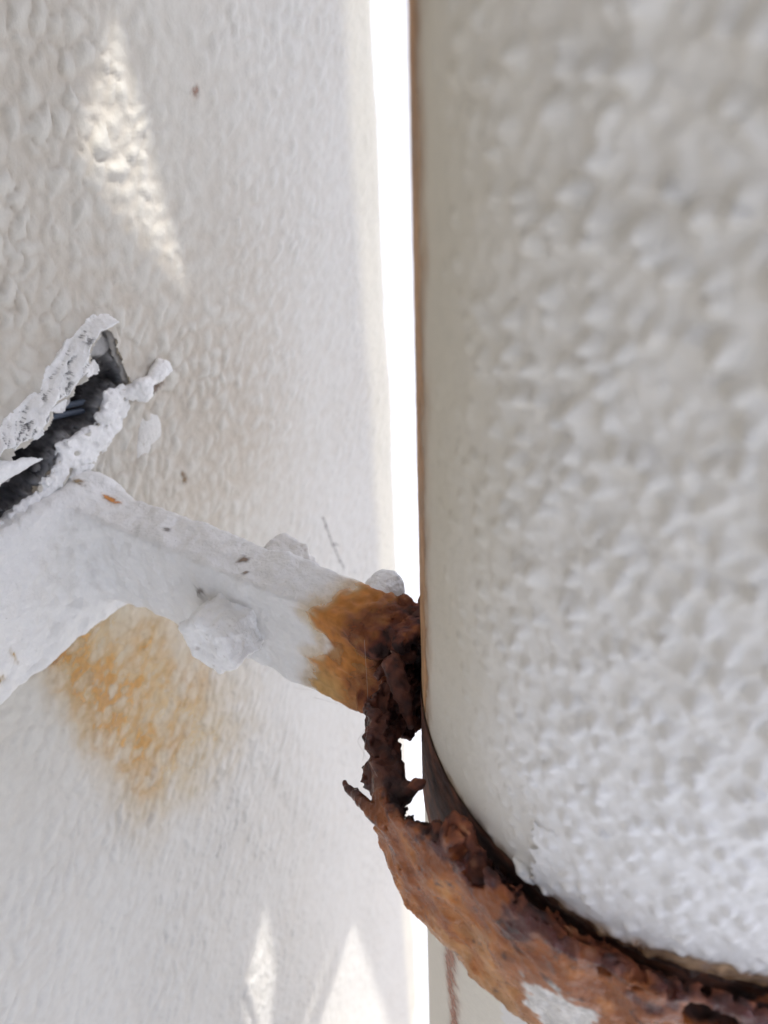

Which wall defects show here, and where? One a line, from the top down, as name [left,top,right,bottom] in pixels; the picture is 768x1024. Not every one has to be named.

corrosion [53,630,167,760]
corrosion [307,582,401,711]
corrosion [445,949,459,1024]
corrosion [598,926,768,986]